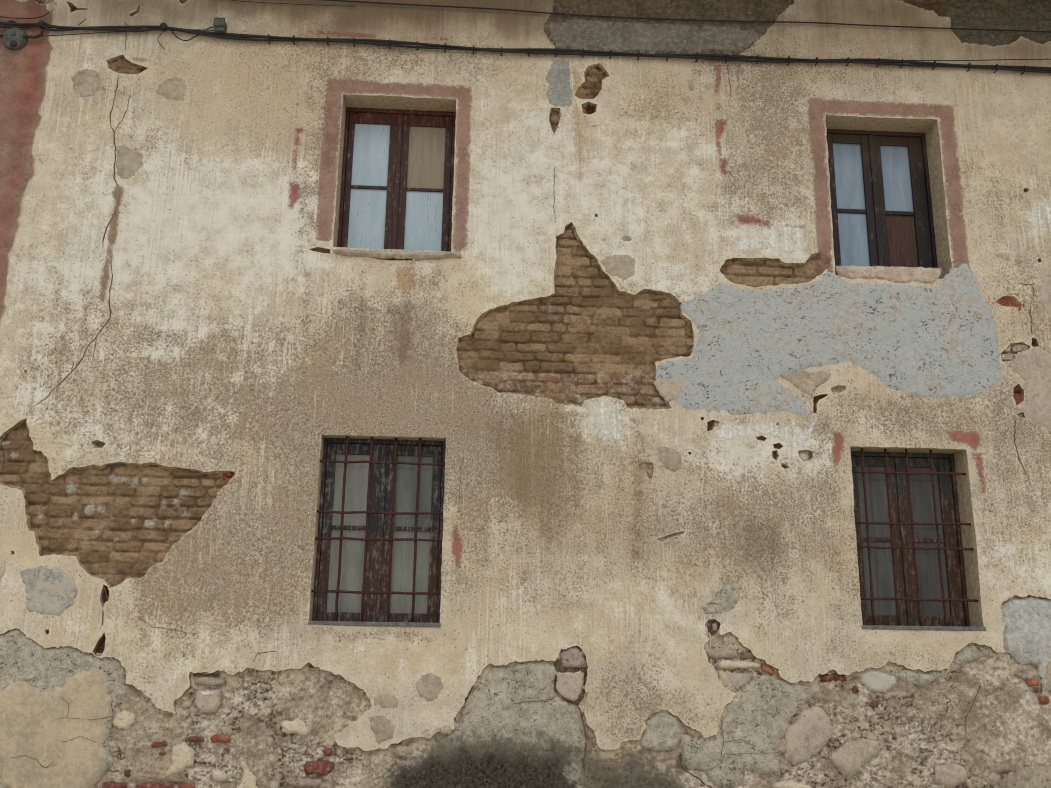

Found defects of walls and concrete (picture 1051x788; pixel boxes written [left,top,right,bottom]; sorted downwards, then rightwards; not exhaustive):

spalling [902,0,1051,47]
spalling [107,55,148,74]
spalling [575,63,609,127]
spalling [549,108,561,134]
crack [33,77,131,409]
spalling [720,252,830,287]
spalling [456,222,694,410]
spalling [813,385,846,414]
spalling [0,418,235,607]
flaking render [1001,595,1051,609]
spalling [30,629,114,660]
flaking render [93,619,1051,788]